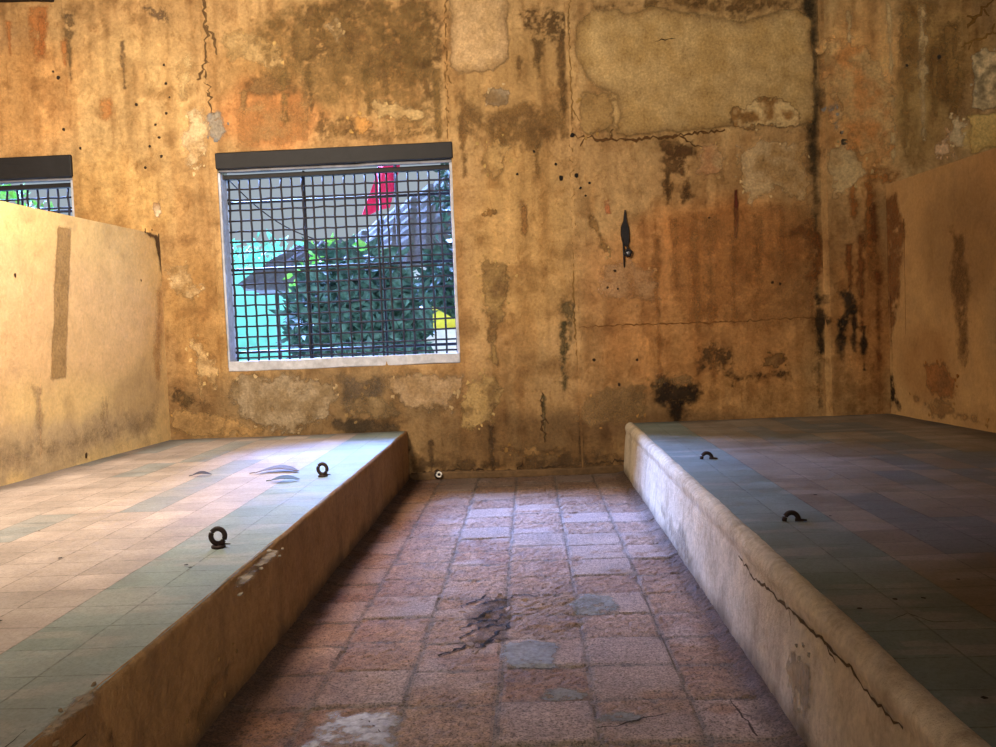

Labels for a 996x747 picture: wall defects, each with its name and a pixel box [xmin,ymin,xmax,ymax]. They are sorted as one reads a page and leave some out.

peeling [182,109,229,176]
crack [196,0,217,114]
water stain [240,0,442,142]
crack [567,0,812,378]
water stain [803,0,825,182]
peeling [935,113,967,159]
spalling [970,48,996,111]
water stain [790,198,868,357]
water stain [559,302,574,390]
water stain [650,378,703,421]
crack [738,556,903,729]
crack [730,700,758,736]